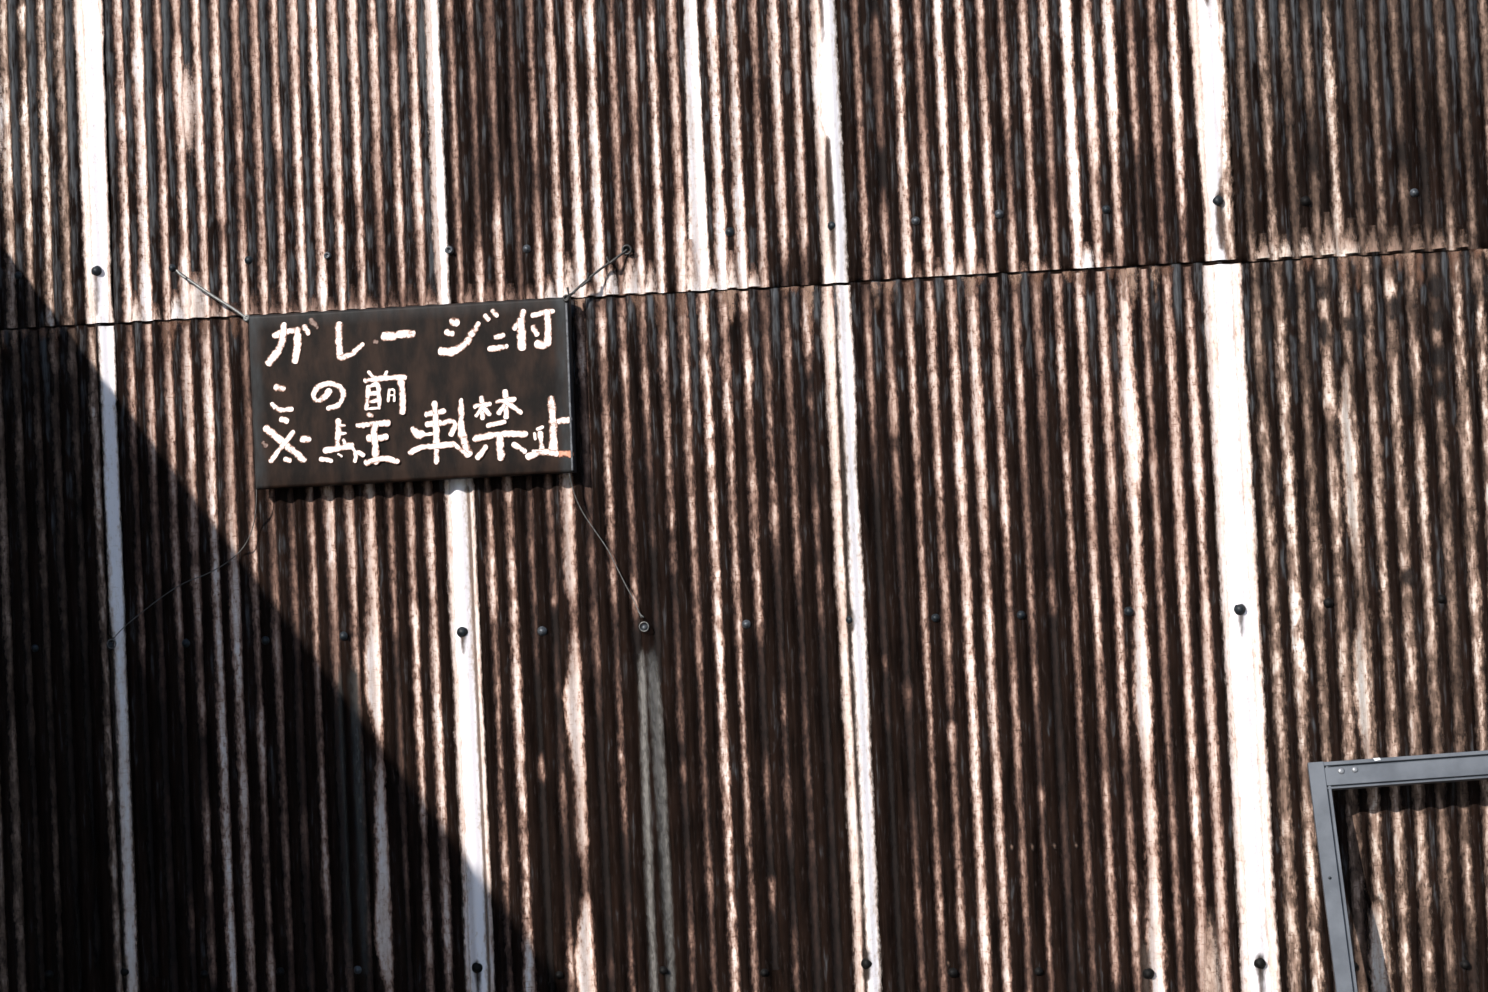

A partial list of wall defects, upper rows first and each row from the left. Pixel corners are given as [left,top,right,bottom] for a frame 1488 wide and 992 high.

corrosion [1338,256,1363,291]
corrosion [1260,282,1298,341]
corrosion [1344,313,1366,335]
corrosion [1382,249,1488,397]